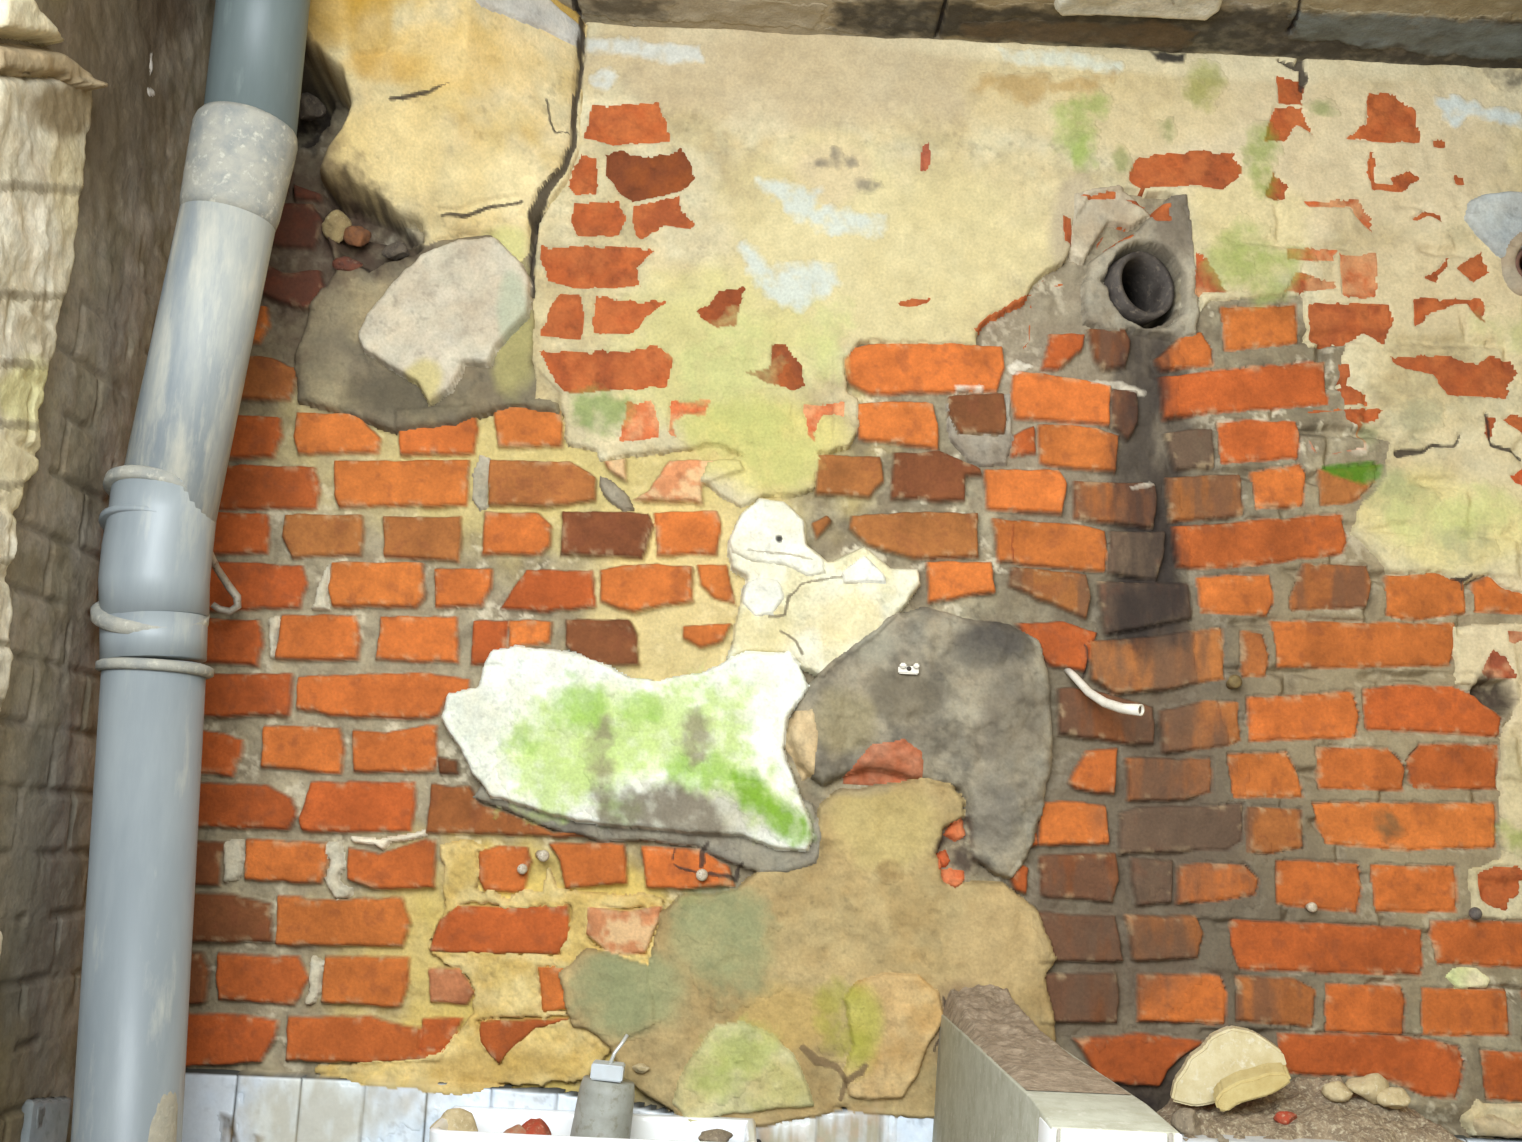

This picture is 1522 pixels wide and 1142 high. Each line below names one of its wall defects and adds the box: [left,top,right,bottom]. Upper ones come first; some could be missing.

crack [440,0,587,300]
peeling [294,0,1522,594]
efflorescence [1088,379,1147,397]
efflorescence [1129,481,1155,491]
peeling [441,645,683,802]
peeling [558,448,1056,1124]
peeling [1451,622,1522,827]
peeling [1467,850,1522,921]
peeling [1446,967,1490,989]
peeling [1460,1099,1522,1139]